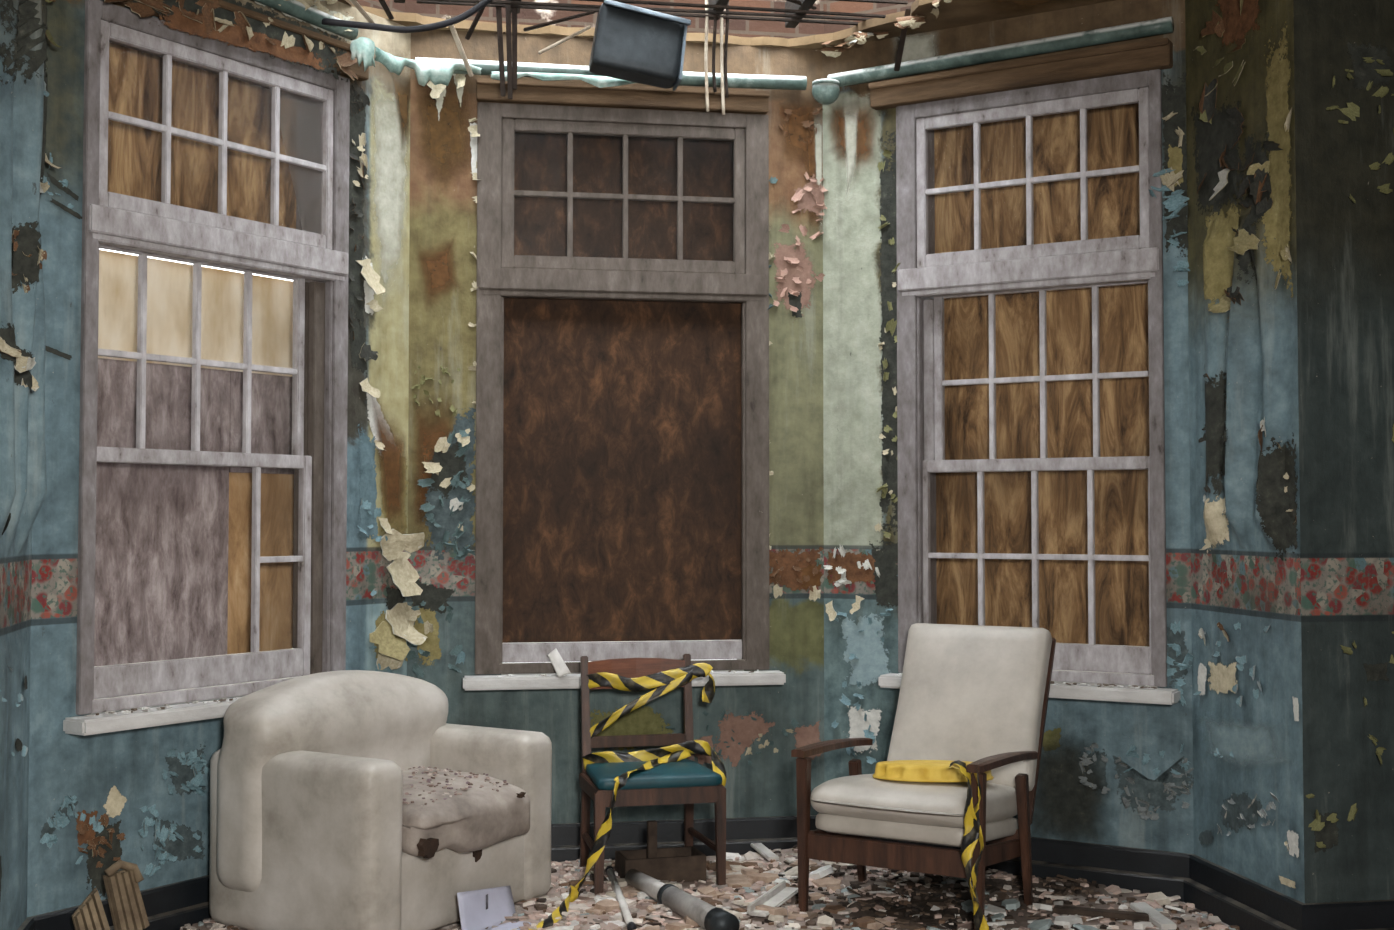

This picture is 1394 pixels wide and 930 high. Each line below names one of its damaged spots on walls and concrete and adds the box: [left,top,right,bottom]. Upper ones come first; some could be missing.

flaking render [820,0,952,58]
peeling [12,221,47,294]
flaking render [104,0,476,563]
peeling [468,118,480,203]
peeling [767,104,828,323]
peeling [1149,73,1190,287]
peeling [0,323,39,391]
peeling [1198,365,1230,553]
peeling [1255,417,1301,564]
peeling [695,608,893,767]
flaking render [40,786,205,897]
peeling [1078,743,1194,820]